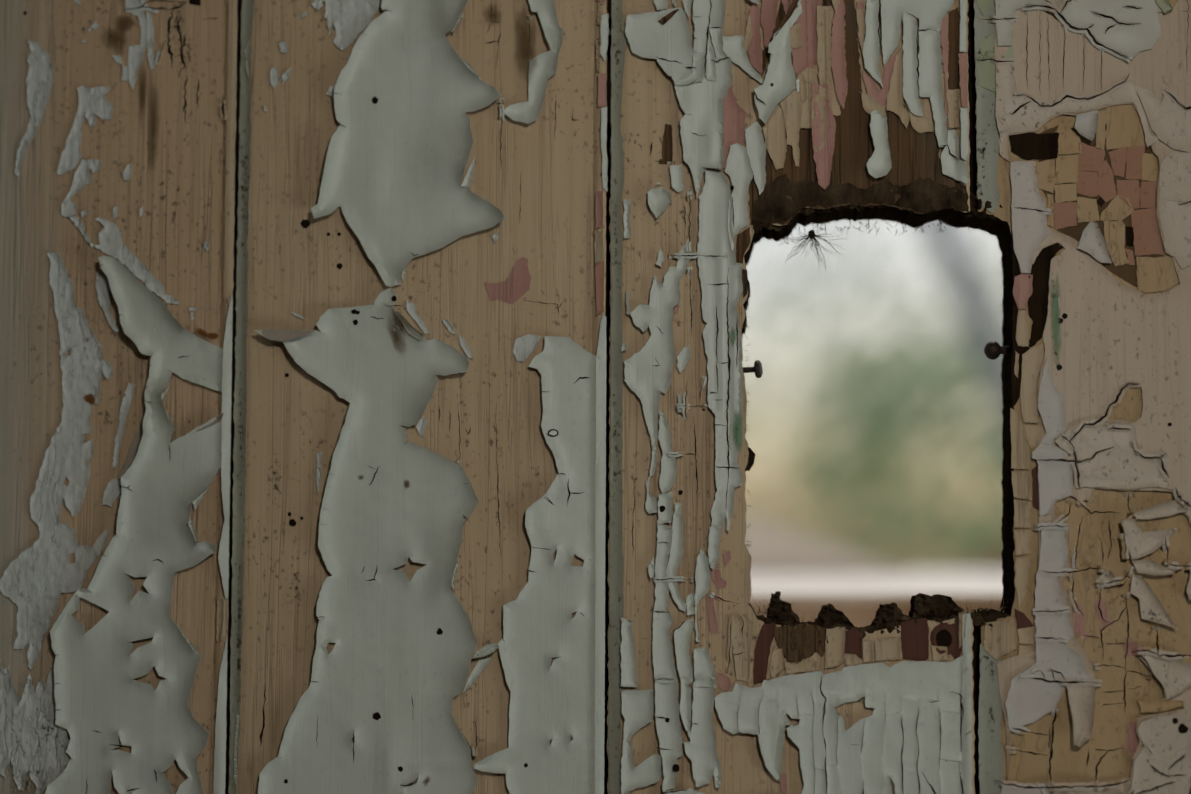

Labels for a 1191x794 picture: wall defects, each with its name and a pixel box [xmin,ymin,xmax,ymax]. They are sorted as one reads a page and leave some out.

crack [657,0,731,86]
crack [875,0,883,55]
crack [916,29,928,89]
crack [976,0,1143,117]
crack [1162,0,1191,114]
crack [1014,204,1051,215]
crack [1179,198,1191,208]
peeling [0,0,254,794]
peeling [255,0,1191,794]
crack [994,380,1191,794]
crack [820,675,864,794]
crack [901,692,971,794]